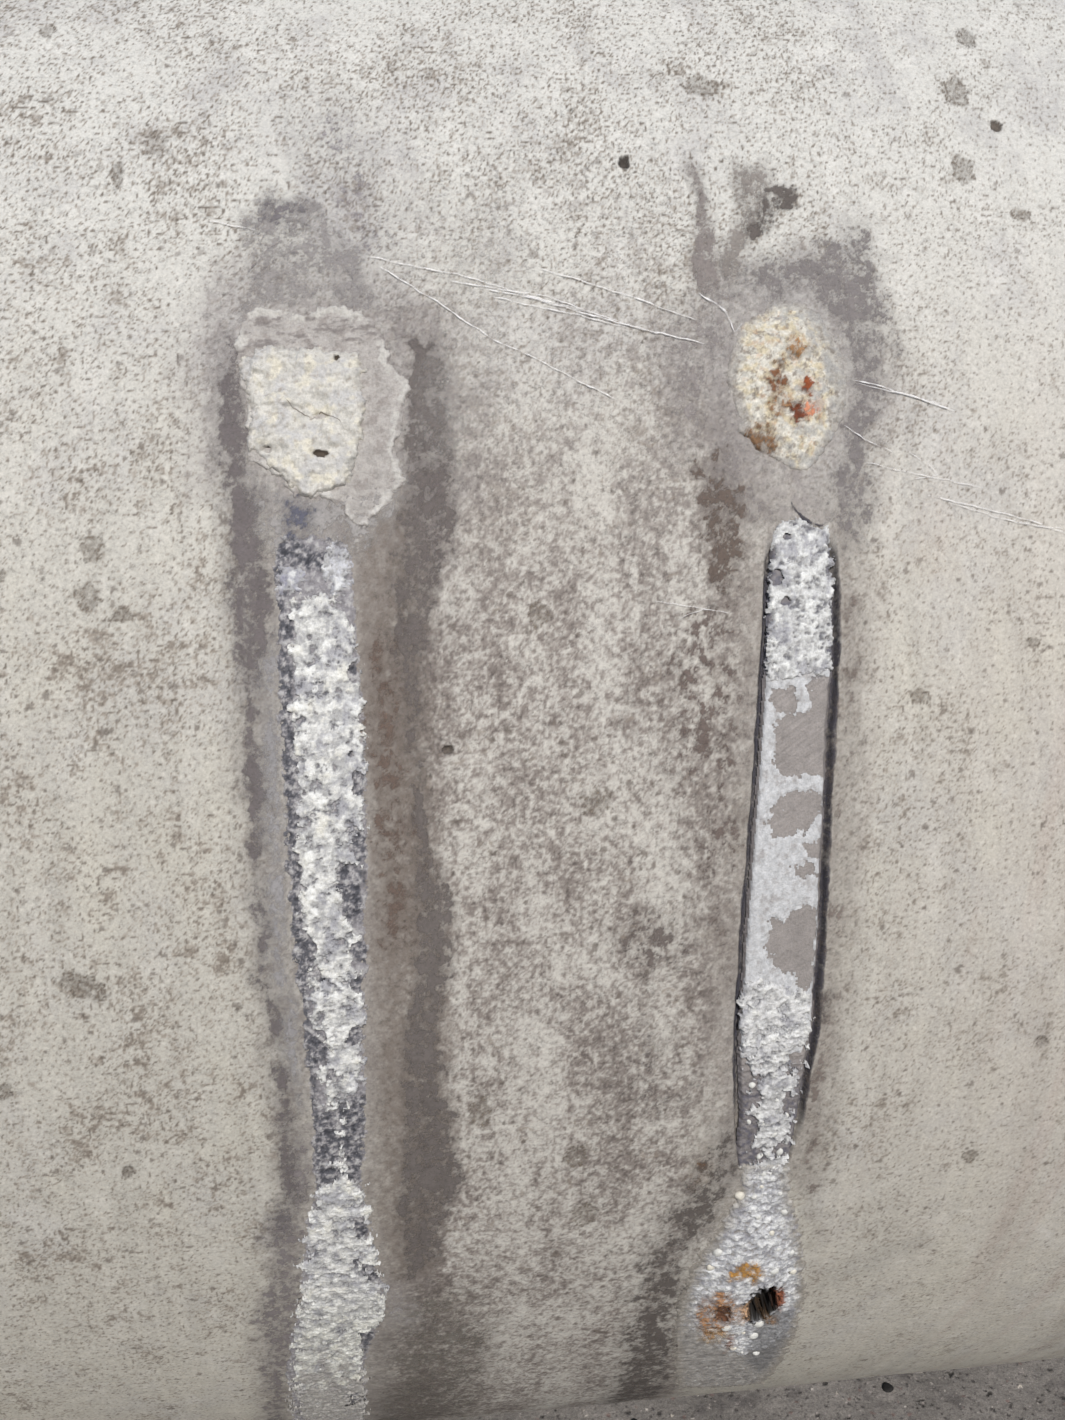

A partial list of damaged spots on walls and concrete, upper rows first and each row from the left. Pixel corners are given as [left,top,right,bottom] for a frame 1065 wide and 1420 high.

corrosion [744,337,819,453]
damp [689,163,903,548]
damp [215,338,286,1040]
damp [352,331,466,1280]
damp [661,445,773,879]
damp [251,1063,309,1420]
damp [376,1297,487,1420]
damp [605,1123,738,1405]
corrosion [696,1263,785,1347]